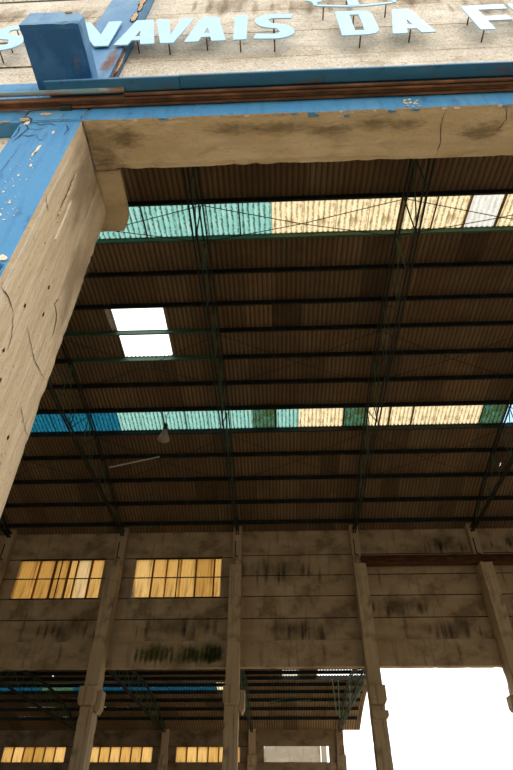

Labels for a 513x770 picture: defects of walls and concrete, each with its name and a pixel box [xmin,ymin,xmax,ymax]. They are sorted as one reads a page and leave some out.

spalling [130,0,147,23]
spalling [0,113,62,125]
crack [0,116,82,172]
spalling [55,174,76,239]